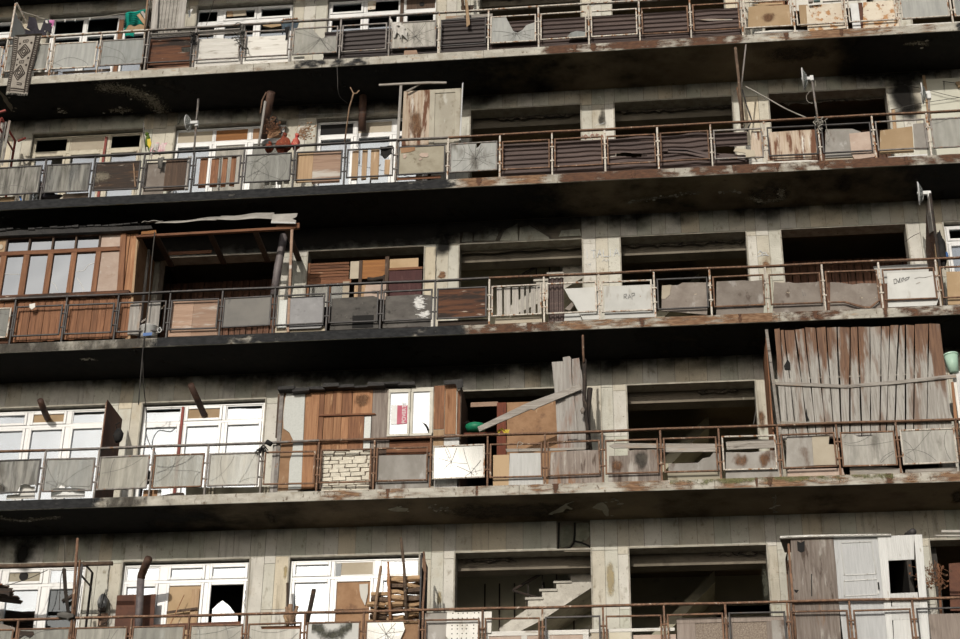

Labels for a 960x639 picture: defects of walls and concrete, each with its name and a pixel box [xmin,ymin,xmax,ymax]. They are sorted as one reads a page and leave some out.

corrosion [559,154,960,182]
corrosion [457,174,547,187]
corrosion [464,310,847,334]
corrosion [883,305,960,317]